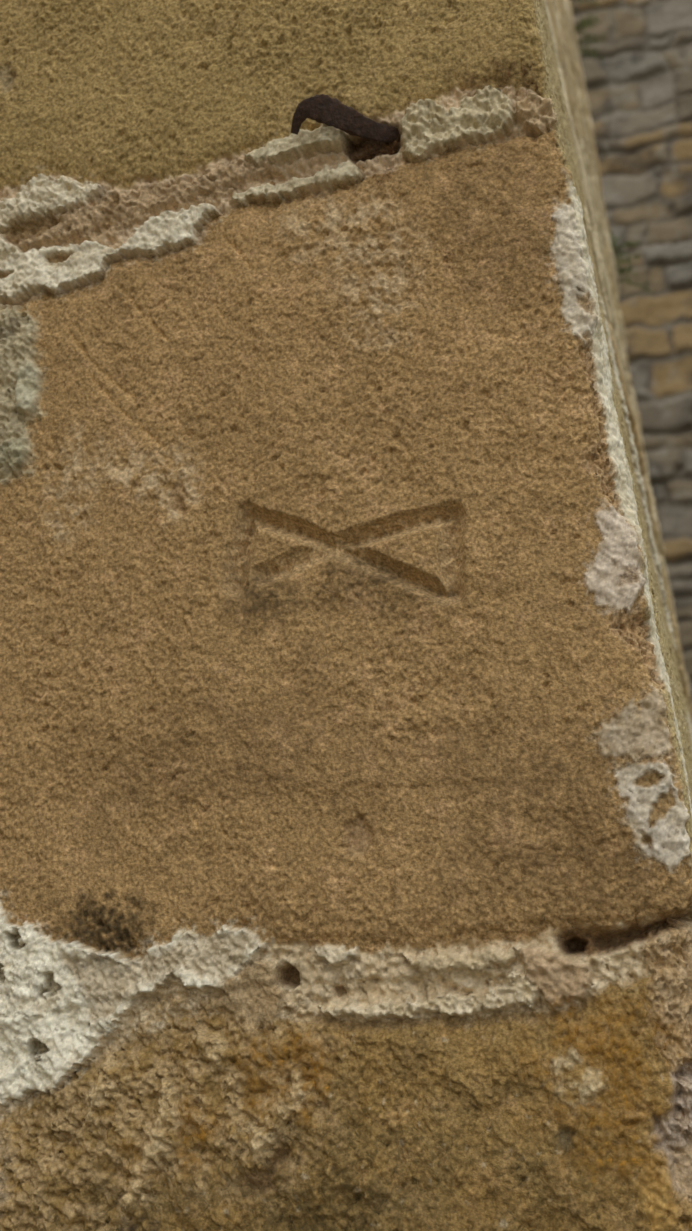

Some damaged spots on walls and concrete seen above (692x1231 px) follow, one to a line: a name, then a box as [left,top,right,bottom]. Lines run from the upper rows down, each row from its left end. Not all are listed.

peeling [552,201,691,870]
crack [555,906,692,957]
crack [287,991,597,1032]